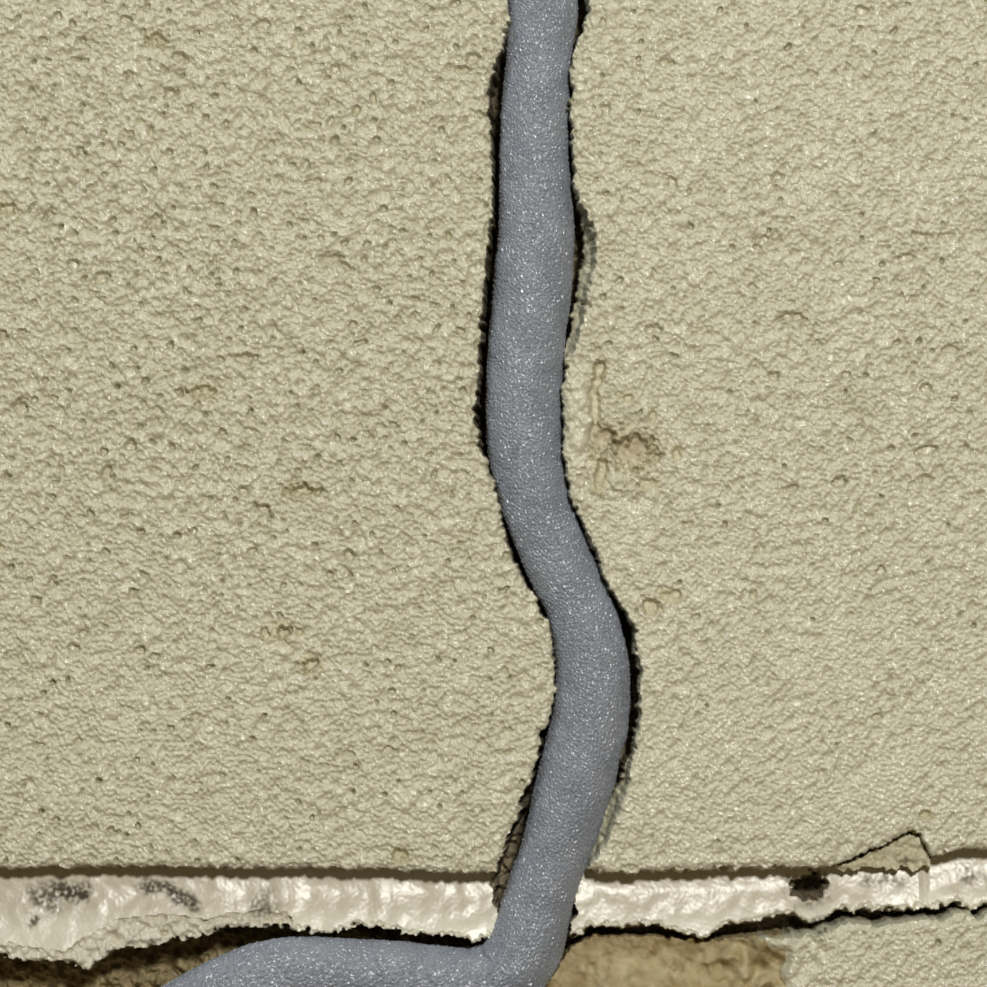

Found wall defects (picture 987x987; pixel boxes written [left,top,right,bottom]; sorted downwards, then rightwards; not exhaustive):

crack [560,0,587,422]
crack [472,0,558,912]
crack [563,462,640,797]
mould [31,883,88,925]
spalling [0,907,297,970]
mould [144,881,198,910]
crack [0,923,487,987]
spalling [546,926,786,987]
crack [560,902,987,960]